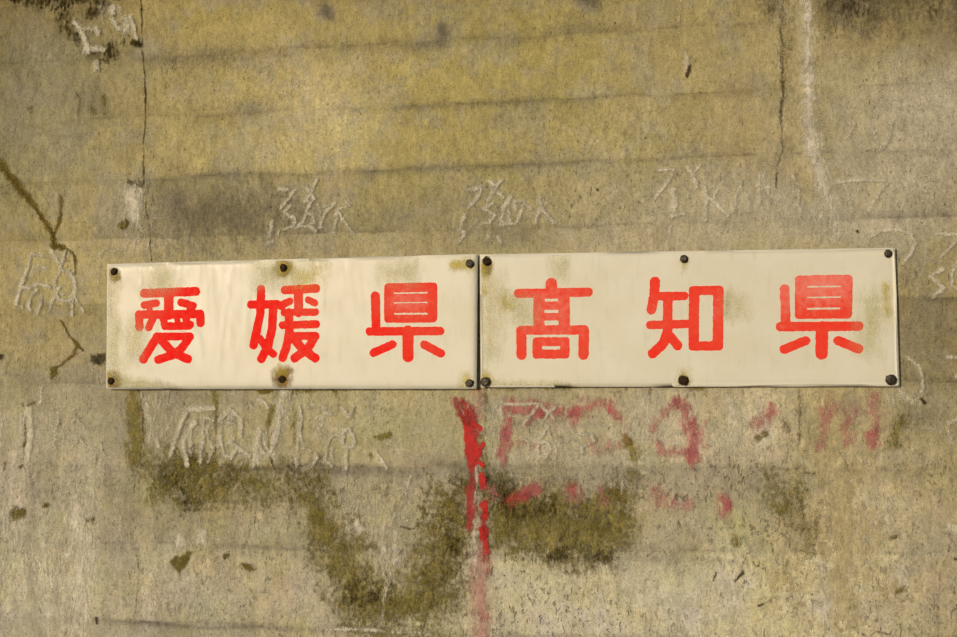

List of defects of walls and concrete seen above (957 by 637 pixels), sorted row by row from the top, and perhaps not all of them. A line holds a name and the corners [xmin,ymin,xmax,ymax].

damp [10,0,105,42]
damp [91,39,142,64]
crack [132,1,148,217]
crack [775,5,795,192]
damp [756,0,909,243]
crack [0,159,77,275]
crack [50,320,83,380]
damp [252,389,345,467]
damp [623,434,641,461]
damp [170,527,207,572]
damp [346,475,411,617]
damp [453,387,515,637]